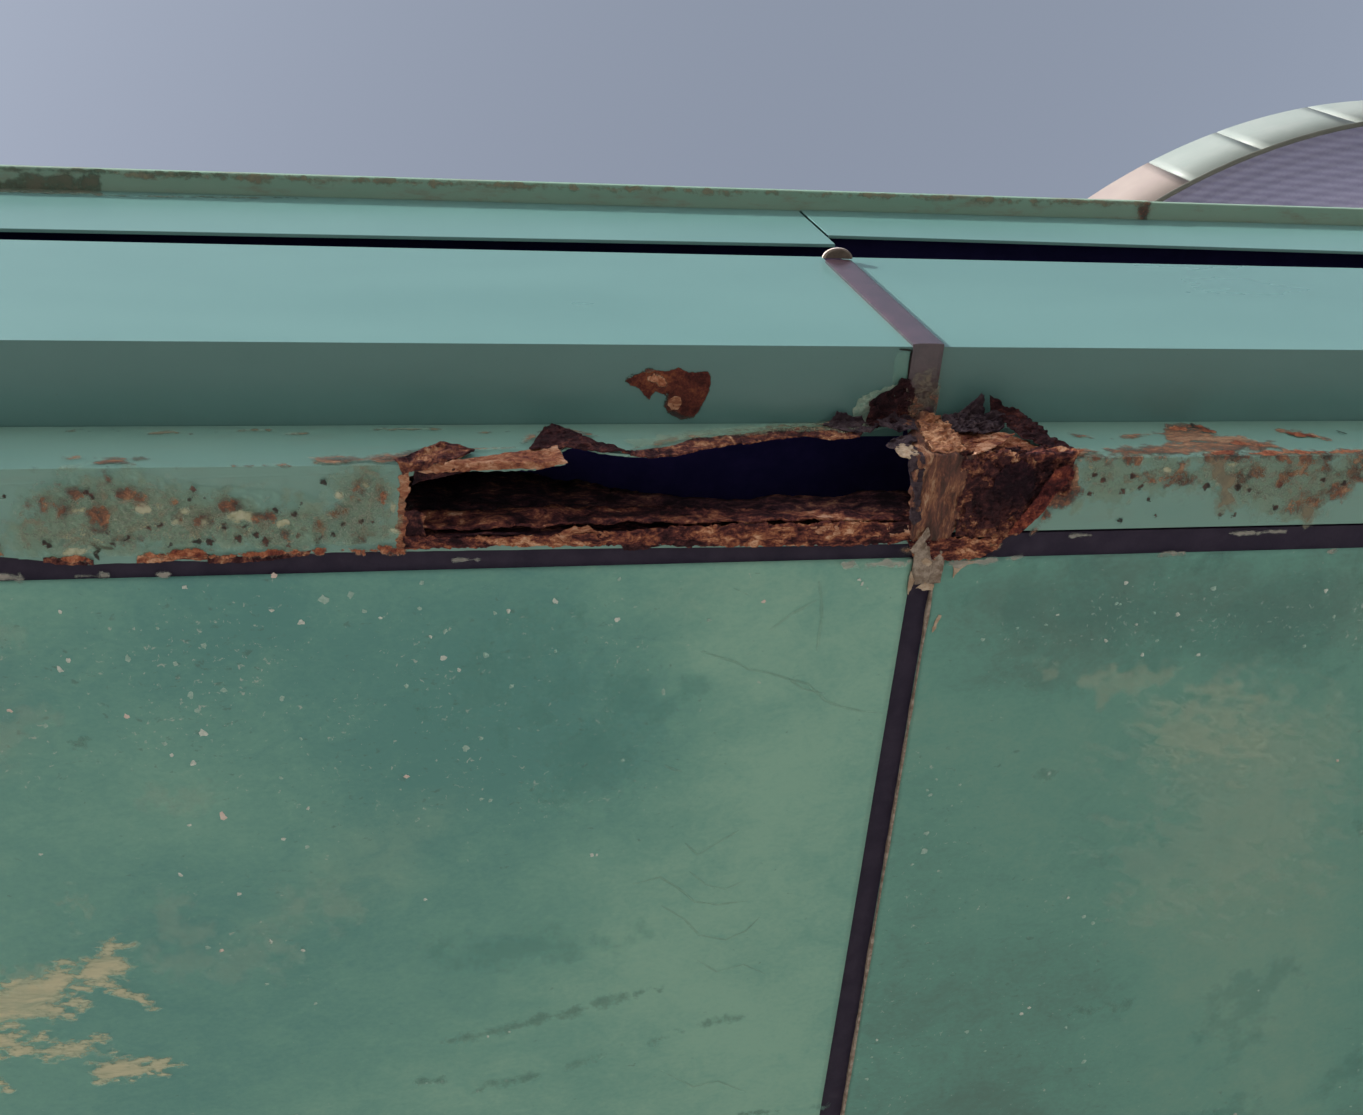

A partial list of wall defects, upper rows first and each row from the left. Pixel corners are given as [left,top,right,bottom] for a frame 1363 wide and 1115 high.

corrosion [67,456,146,465]
corrosion [137,367,1019,594]
corrosion [1071,423,1363,527]
corrosion [43,554,94,566]